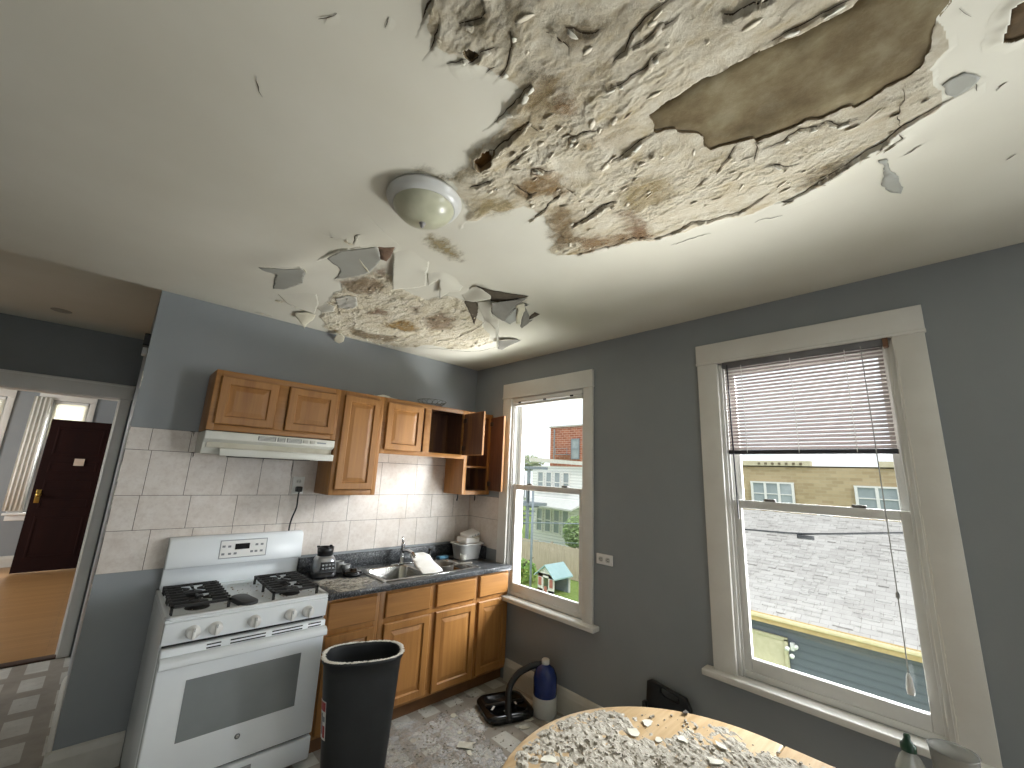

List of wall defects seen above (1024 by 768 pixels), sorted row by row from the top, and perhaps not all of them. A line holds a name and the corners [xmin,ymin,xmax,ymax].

peeling [221,0,1011,352]
peeling [980,0,1024,55]